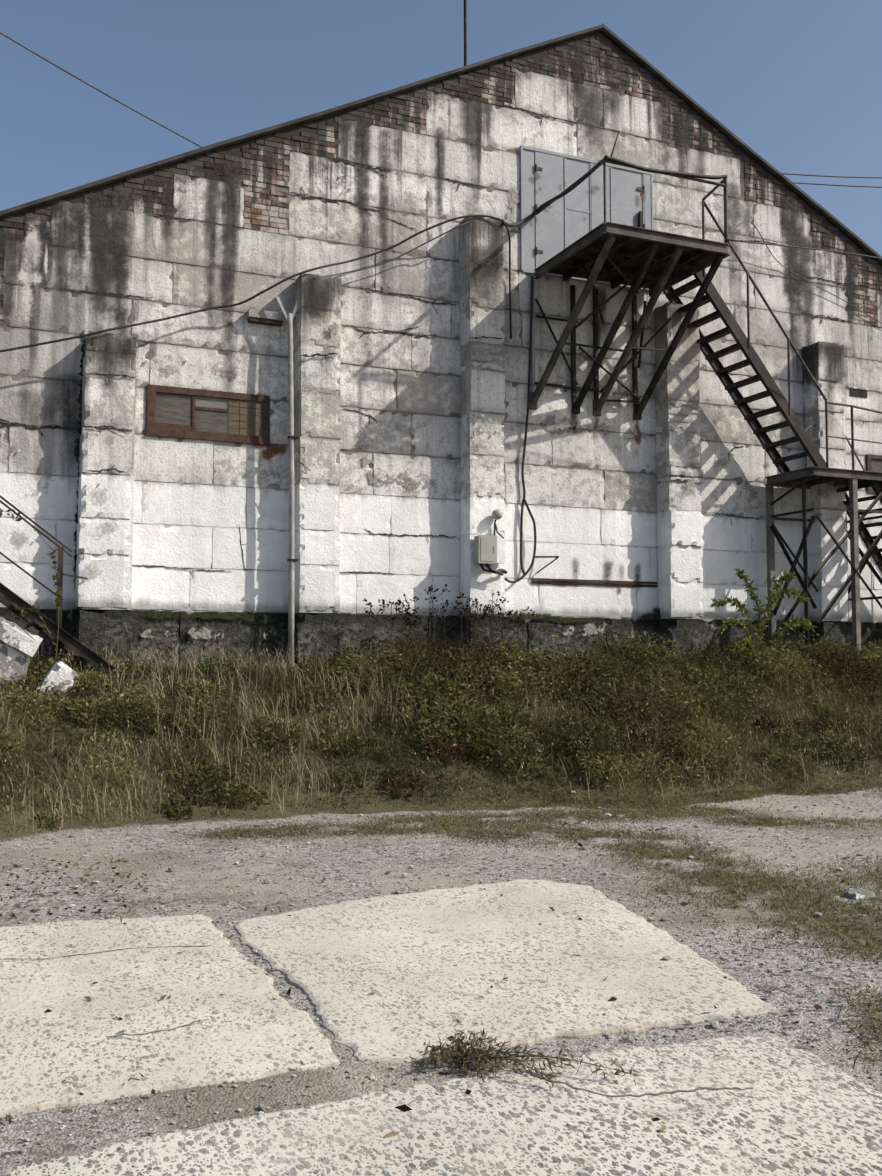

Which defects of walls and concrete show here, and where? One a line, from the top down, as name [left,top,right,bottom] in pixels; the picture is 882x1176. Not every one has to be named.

damp [462,98,482,148]
damp [162,179,174,235]
damp [356,124,390,254]
damp [437,128,445,217]
damp [39,189,136,385]
damp [206,162,241,340]
damp [303,274,339,315]
damp [471,220,504,299]
damp [782,197,857,391]
corrosion [252,444,286,459]
crack [520,1068,754,1097]